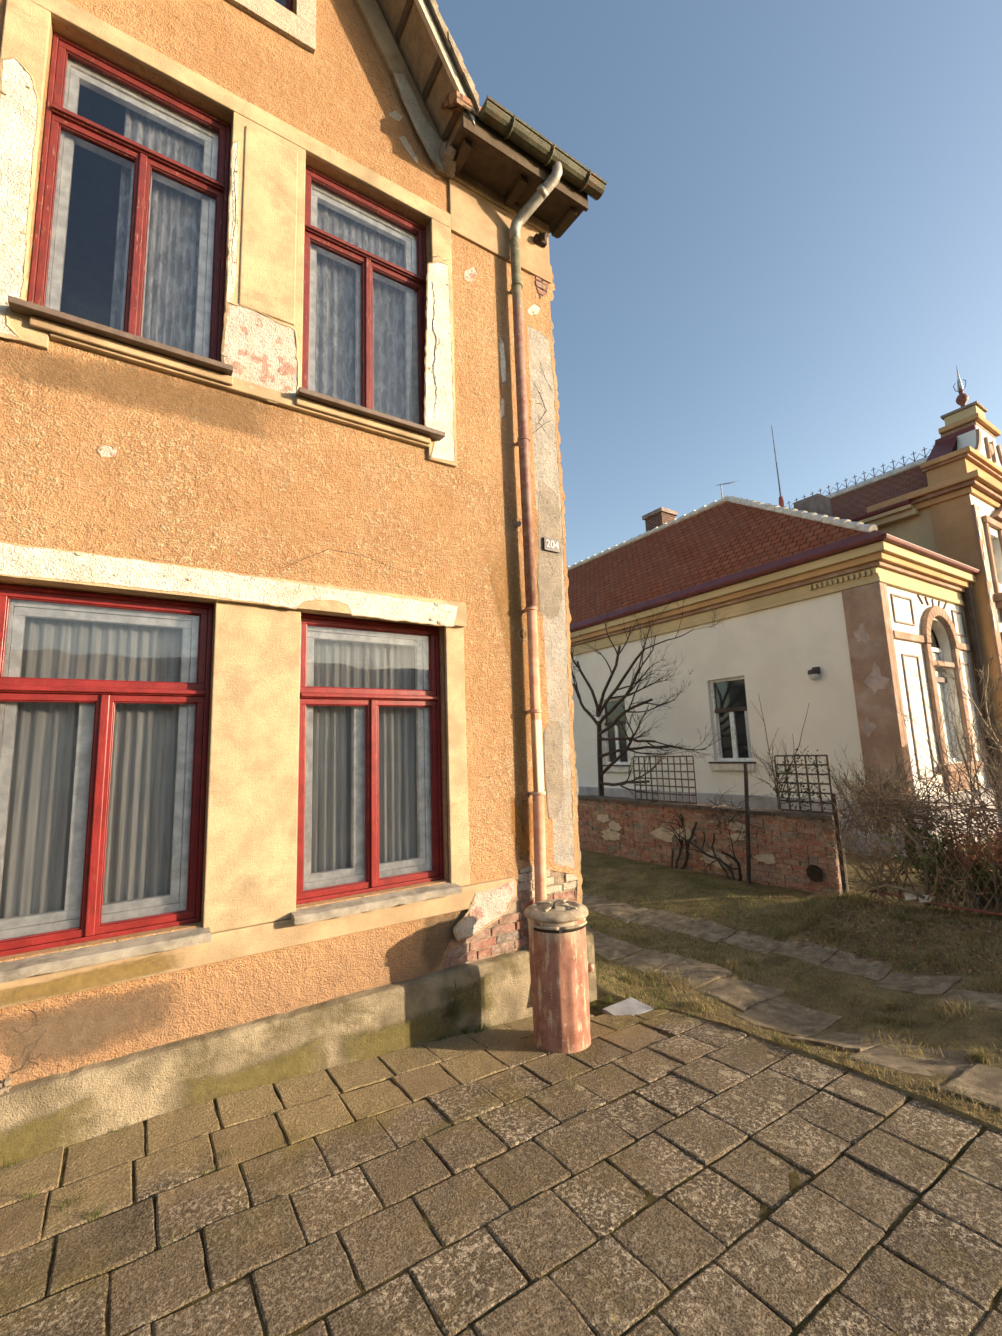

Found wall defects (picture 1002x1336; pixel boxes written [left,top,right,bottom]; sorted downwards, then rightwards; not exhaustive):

flaking render [221,141,300,403]
spalling [96,443,119,459]
flaking render [0,542,458,627]
flaking render [434,265,583,972]
flaking render [0,1038,19,1083]